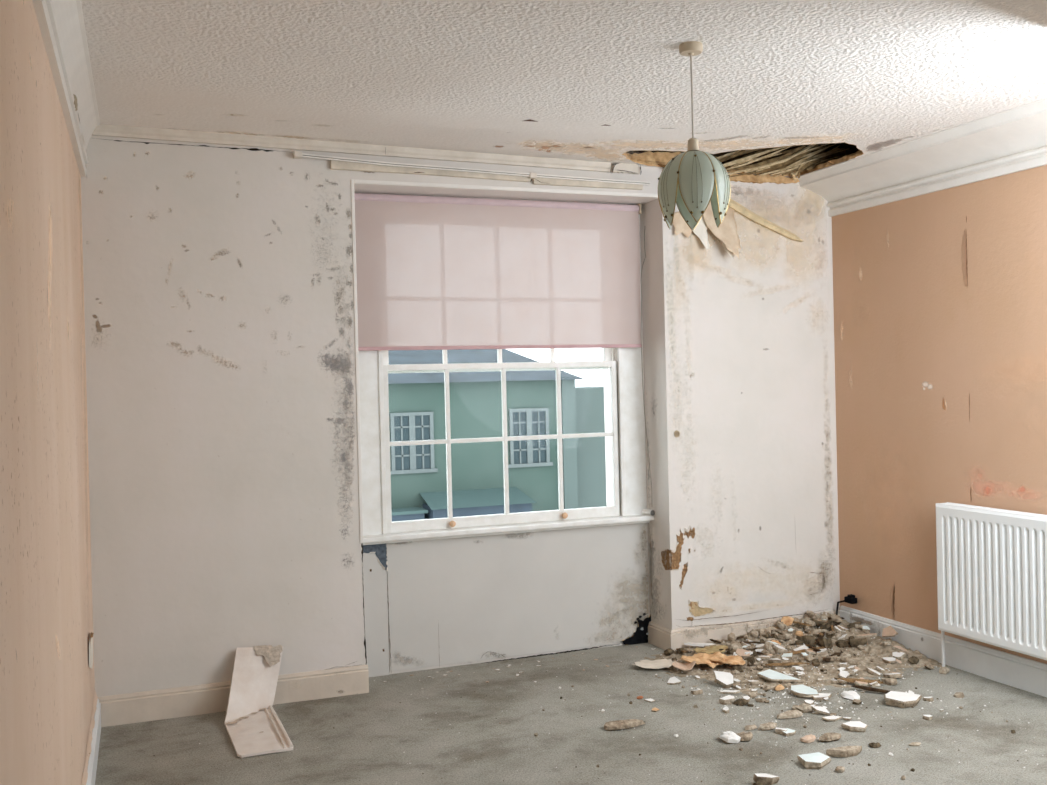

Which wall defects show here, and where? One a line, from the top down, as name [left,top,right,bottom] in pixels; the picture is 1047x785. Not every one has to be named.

spalling [622,150,685,167]
spalling [710,142,863,178]
leakage [311,180,353,343]
leakage [323,354,353,440]
peeling [363,544,388,571]
flaking render [661,526,695,589]
flaking render [686,600,716,621]